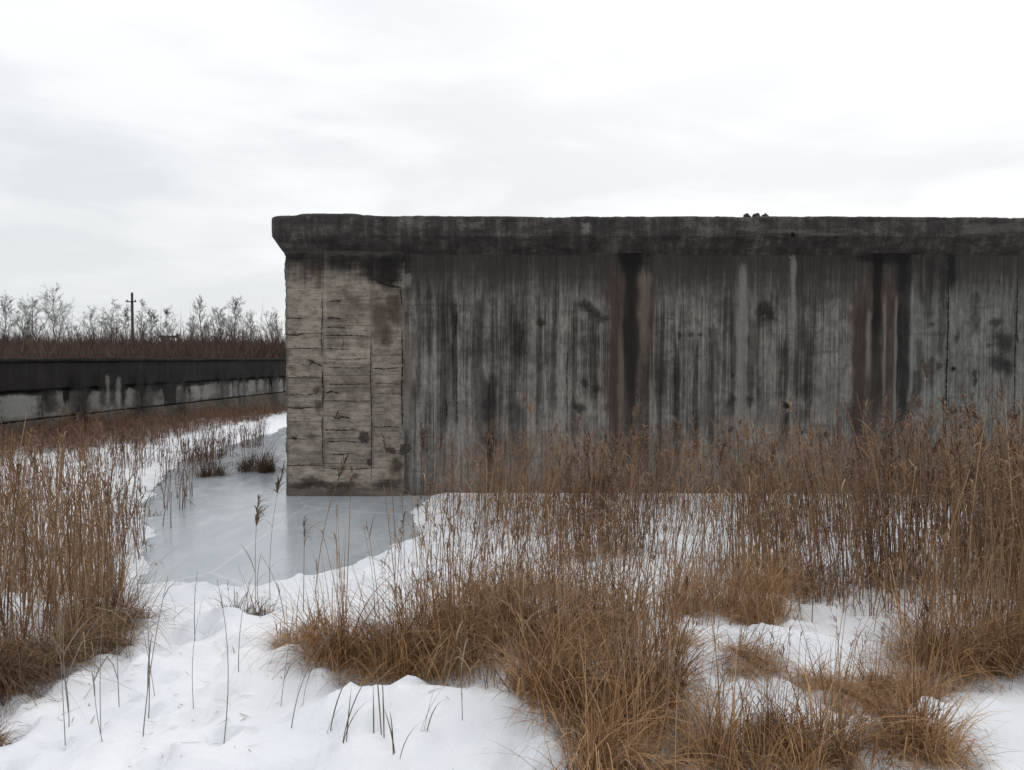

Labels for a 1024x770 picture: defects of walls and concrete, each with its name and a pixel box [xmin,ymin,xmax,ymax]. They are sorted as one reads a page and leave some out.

leakage [363,254,410,283]
crack [374,279,403,304]
leakage [0,390,56,418]
leakage [74,371,156,430]
crack [284,294,404,478]
leakage [485,374,497,462]
corrosion [606,253,650,450]
leakage [674,332,703,458]
corrosion [865,273,899,437]
leakage [862,253,911,427]
leakage [987,320,1012,375]